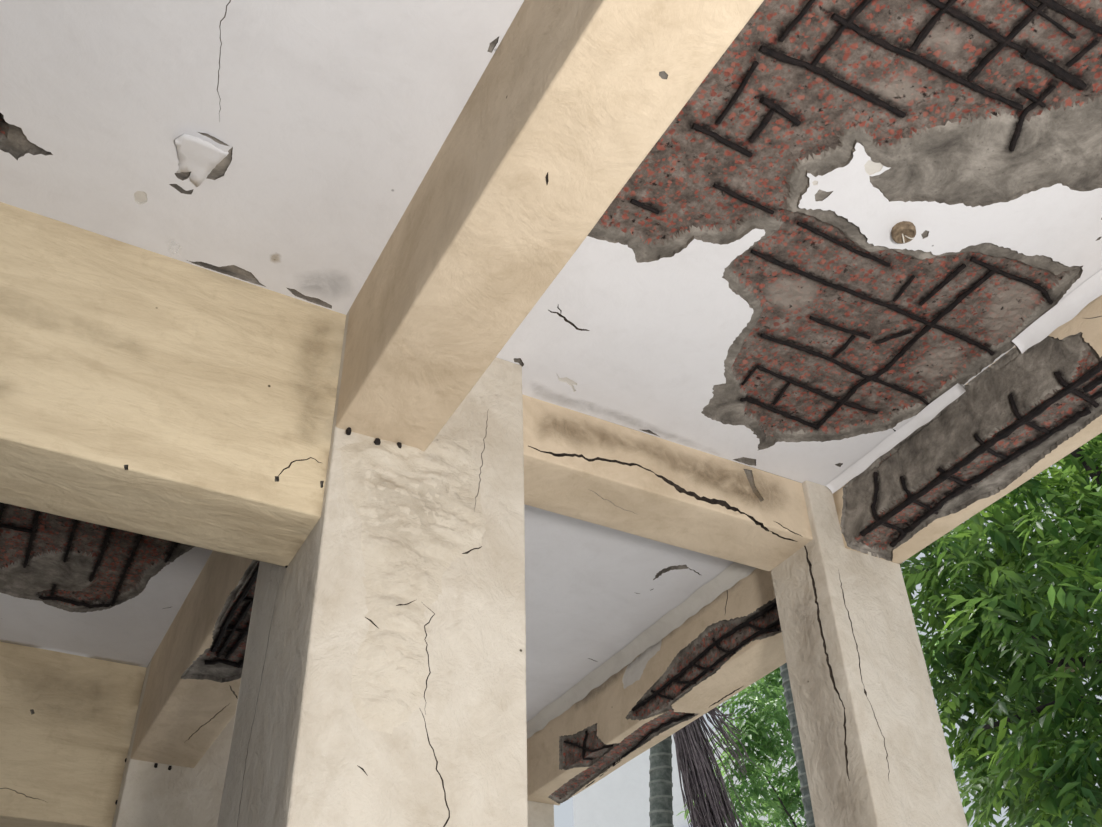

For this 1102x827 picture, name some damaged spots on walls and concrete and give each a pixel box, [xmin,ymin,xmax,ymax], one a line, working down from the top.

spalling [0,113,53,161]
crack [217,0,231,122]
spalling [587,0,1102,561]
spalling [0,502,195,613]
spalling [181,560,260,683]
crack [396,600,450,827]
spalling [548,598,782,804]
crack [529,446,890,781]